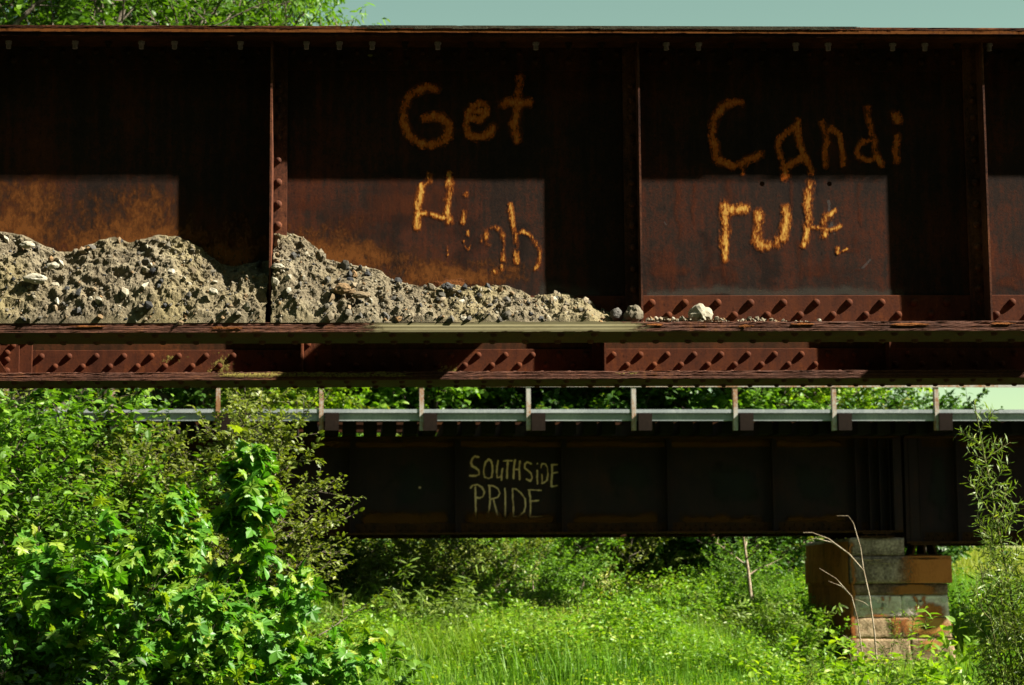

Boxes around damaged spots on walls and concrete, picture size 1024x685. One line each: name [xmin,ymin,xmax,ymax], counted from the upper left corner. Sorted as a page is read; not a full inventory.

rust [0,177,268,266]
rust [288,225,525,287]